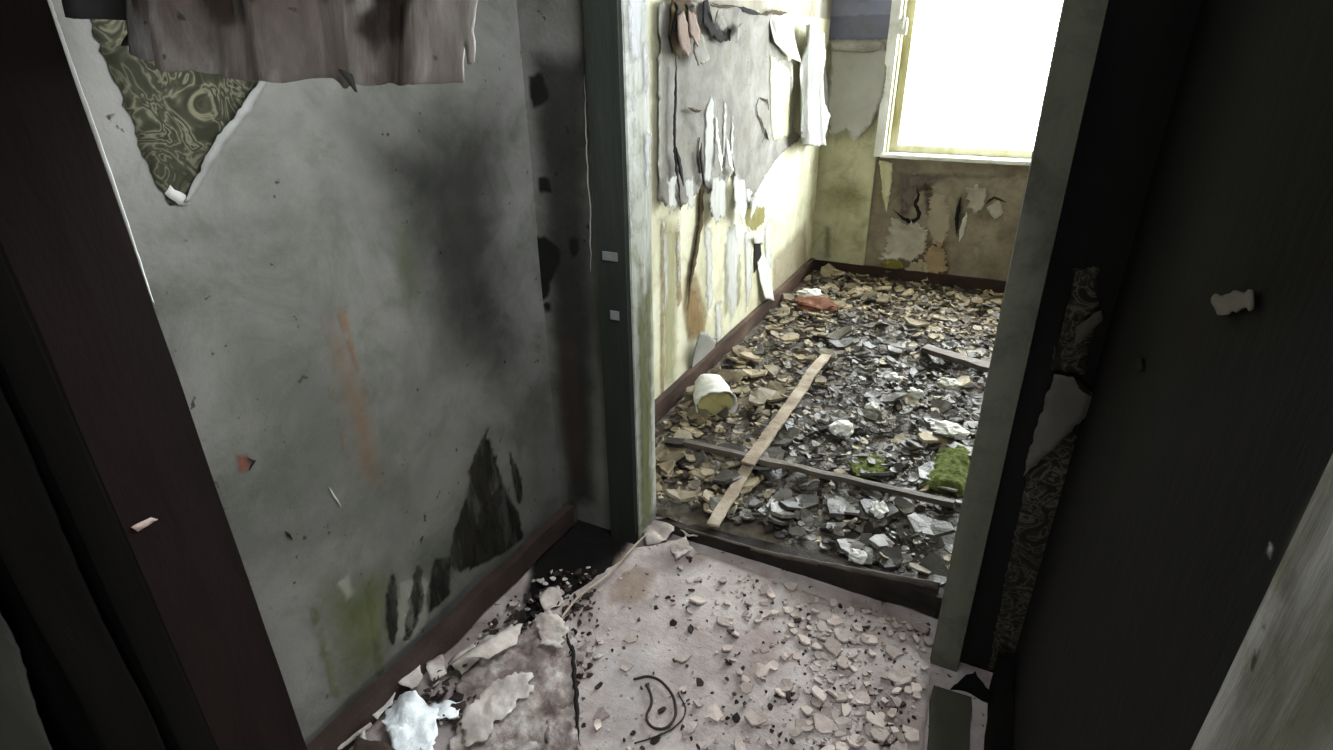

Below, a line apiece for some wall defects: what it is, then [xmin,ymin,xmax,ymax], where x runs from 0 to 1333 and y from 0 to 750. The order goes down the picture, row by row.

peeling [628,0,648,110]
spalling [669,0,746,66]
peeling [769,14,801,140]
peeling [630,132,652,192]
peeling [663,96,774,368]
peeling [878,160,951,285]
peeling [965,184,1004,220]
leakage [370,431,523,675]